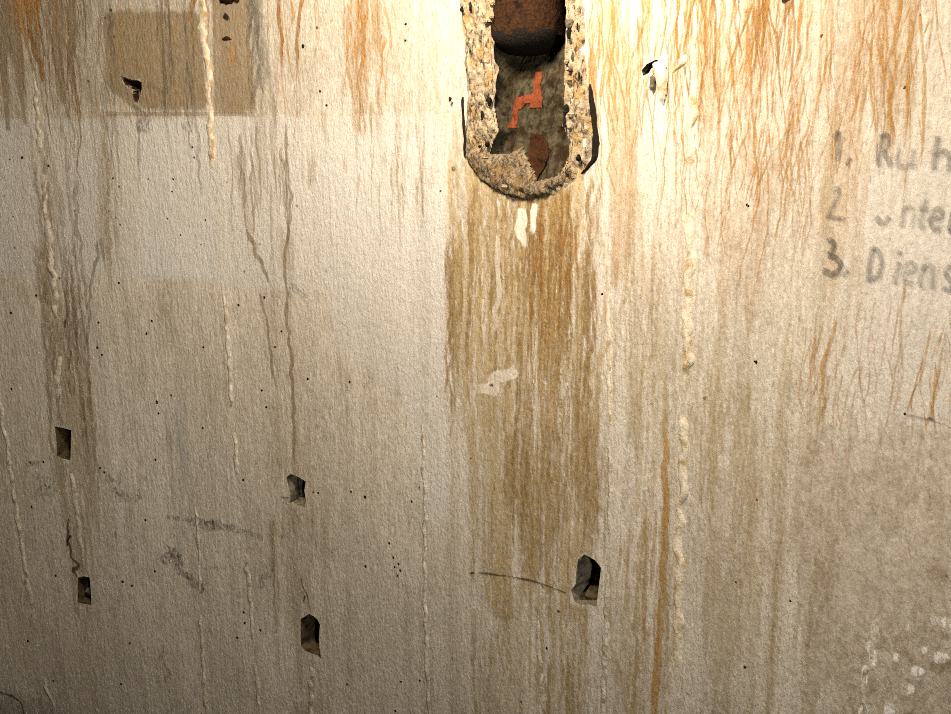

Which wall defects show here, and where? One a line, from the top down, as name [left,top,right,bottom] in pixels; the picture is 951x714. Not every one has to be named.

corrosion [8,0,44,81]
spalling [460,0,499,159]
corrosion [528,133,549,178]
spalling [546,0,593,197]
corrosion [588,0,630,139]
corrosion [637,0,812,233]
corrosion [830,0,938,174]
corrosion [457,194,476,282]
corrosion [518,188,576,444]